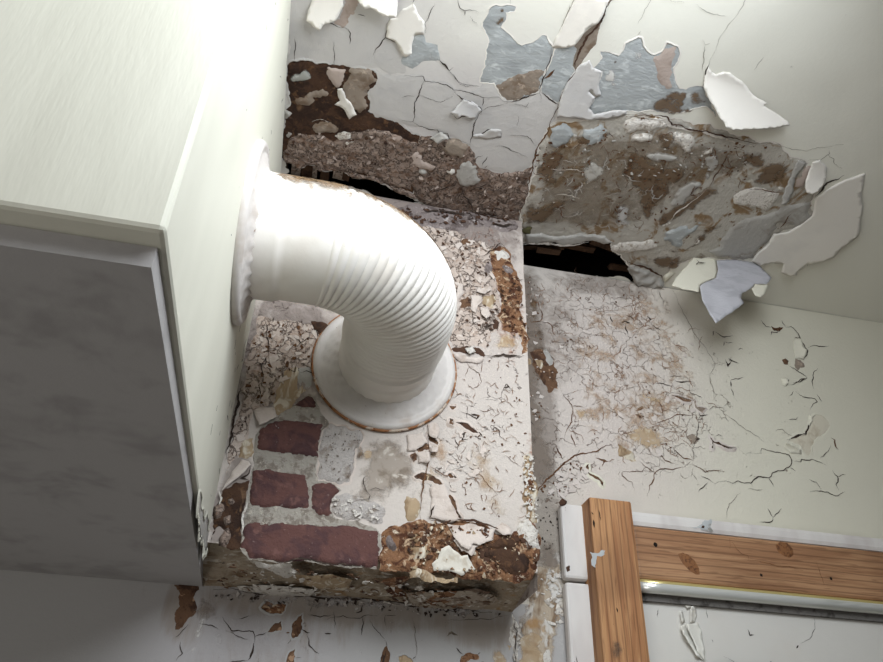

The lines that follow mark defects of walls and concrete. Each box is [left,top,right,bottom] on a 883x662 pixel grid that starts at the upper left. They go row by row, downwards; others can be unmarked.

peeling [282,0,790,349]
crack [512,0,612,216]
crack [642,0,745,67]
crack [214,588,417,662]
flaking render [196,316,543,662]
corrosion [378,453,541,584]
crack [538,388,606,491]
crack [622,291,844,510]